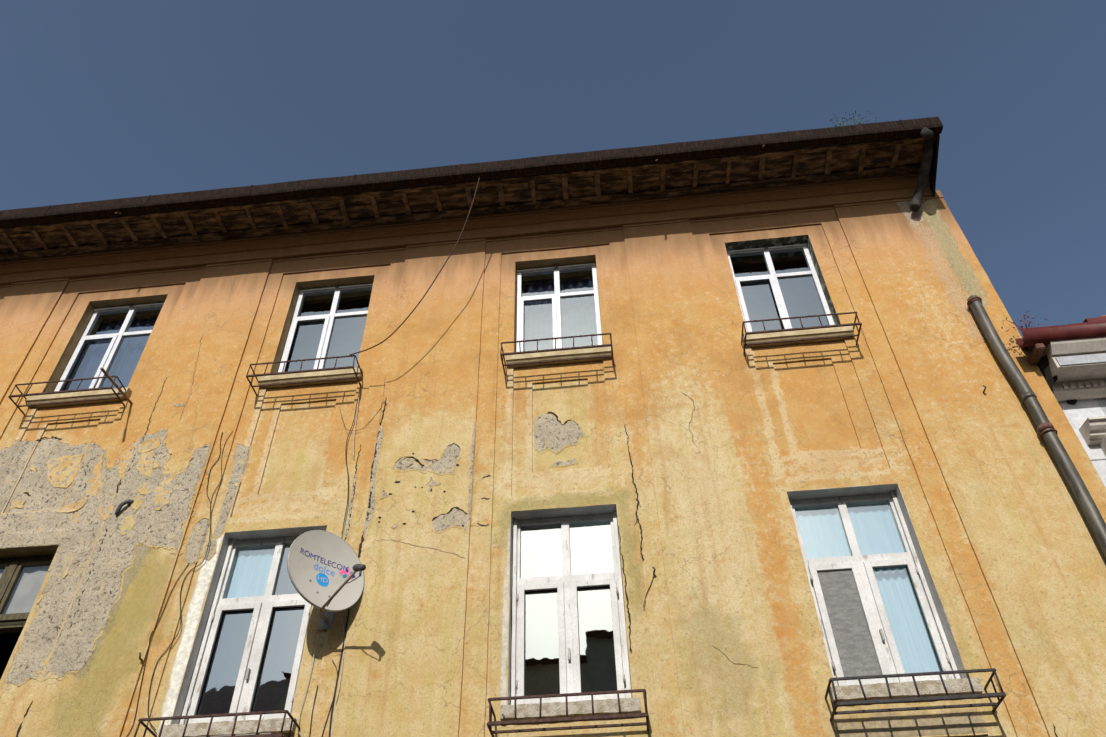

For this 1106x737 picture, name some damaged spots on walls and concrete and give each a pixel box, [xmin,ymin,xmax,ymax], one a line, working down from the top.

spalling [344,423,478,541]
peeling [531,412,587,468]
peeling [0,424,252,687]